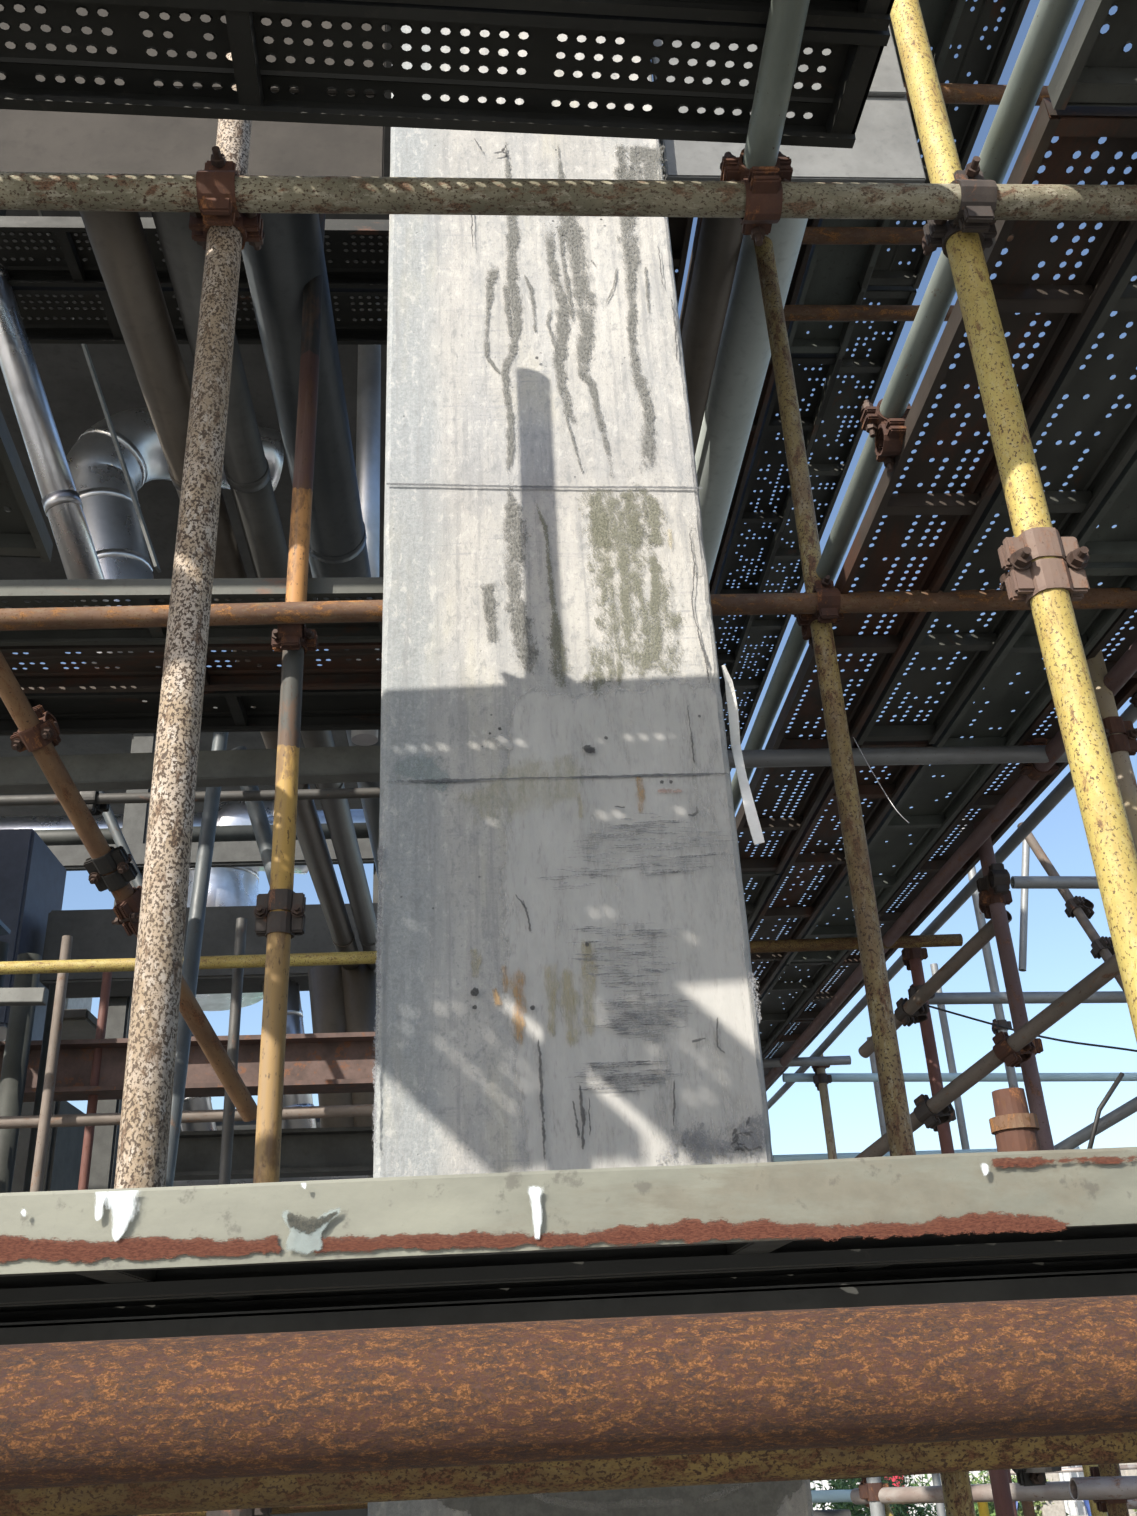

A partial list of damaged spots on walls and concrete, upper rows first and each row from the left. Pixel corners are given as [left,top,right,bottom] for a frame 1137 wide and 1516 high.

leakage [480,215,667,687]
corrosion [0,1235,282,1264]
corrosion [312,1211,1069,1253]